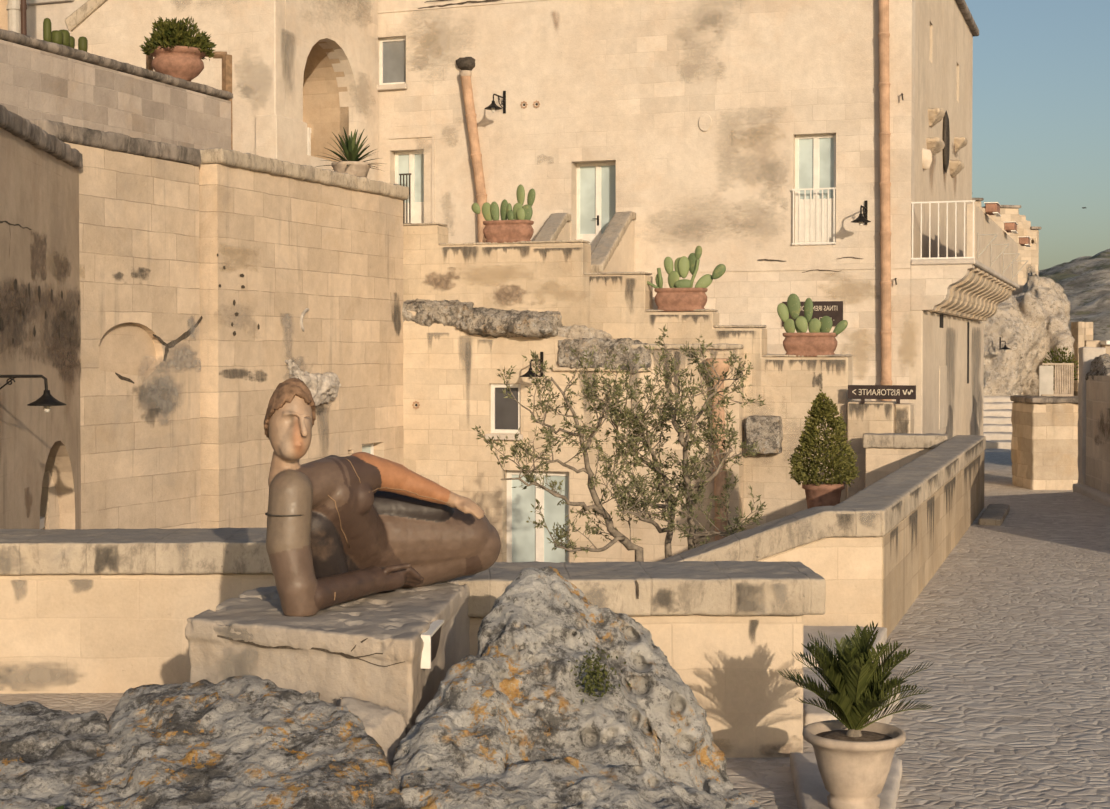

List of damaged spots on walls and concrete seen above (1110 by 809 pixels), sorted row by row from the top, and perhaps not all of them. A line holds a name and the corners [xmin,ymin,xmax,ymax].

crack [418,0,498,9]
crack [0,221,31,254]
water stain [443,246,580,258]
water stain [590,276,634,297]
water stain [651,315,708,324]
crack [153,316,203,361]
crack [115,372,134,384]
water stain [890,440,983,544]